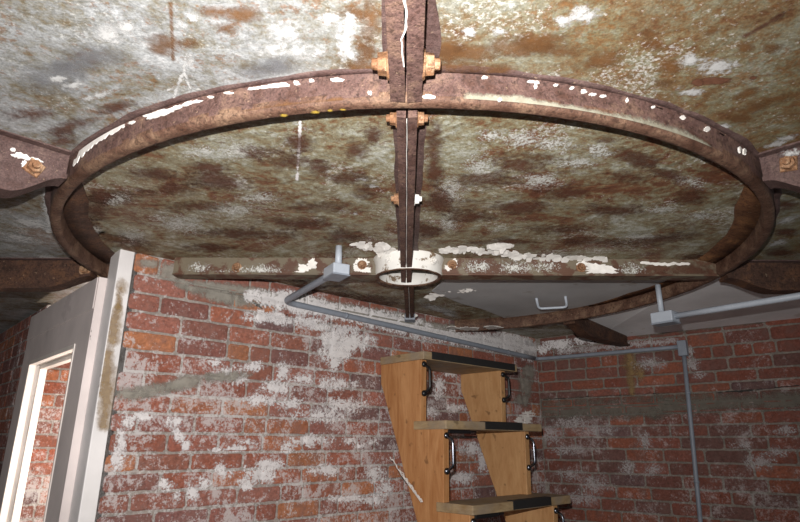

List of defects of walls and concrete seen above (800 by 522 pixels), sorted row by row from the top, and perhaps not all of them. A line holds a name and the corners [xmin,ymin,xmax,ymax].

peeling [73,96,214,167]
rust [242,135,327,173]
peeling [465,80,710,146]
peeling [765,136,799,156]
rust [131,163,240,193]
rust [426,129,492,222]
rust [188,219,360,251]
peeling [350,241,396,273]
peeling [439,242,690,274]
damp [157,288,677,507]
damp [110,411,153,473]
damp [731,442,791,470]